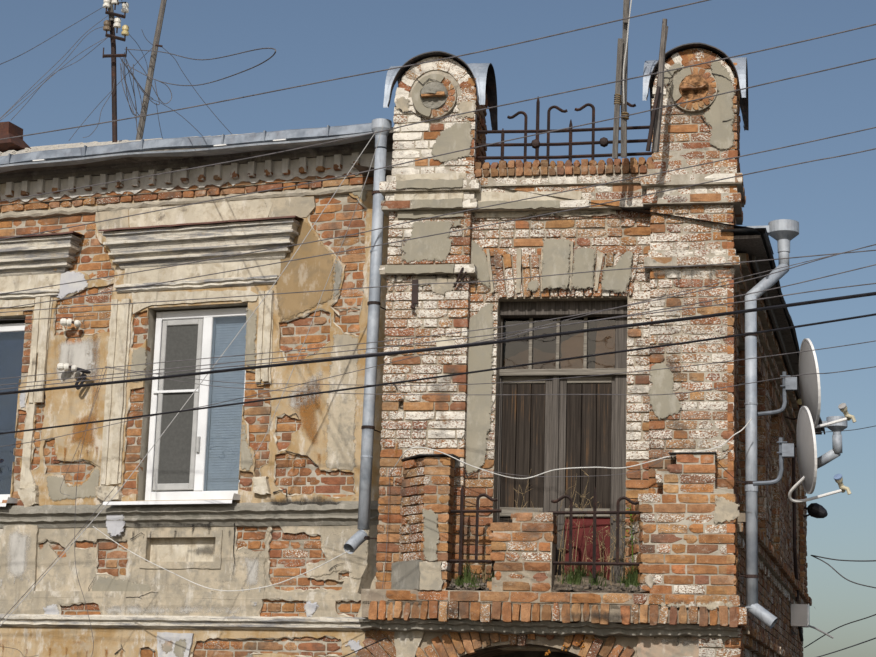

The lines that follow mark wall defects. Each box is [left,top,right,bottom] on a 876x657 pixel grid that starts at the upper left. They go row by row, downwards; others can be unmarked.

flaking render [0,214,115,344]
flaking render [130,311,151,351]
flaking render [279,194,367,361]
flaking render [2,373,96,506]
flaking render [122,387,144,497]
flaking render [240,371,355,498]
flaking render [43,602,102,615]
flaking render [38,539,128,576]
flaking render [190,635,342,657]
flaking render [235,526,361,617]